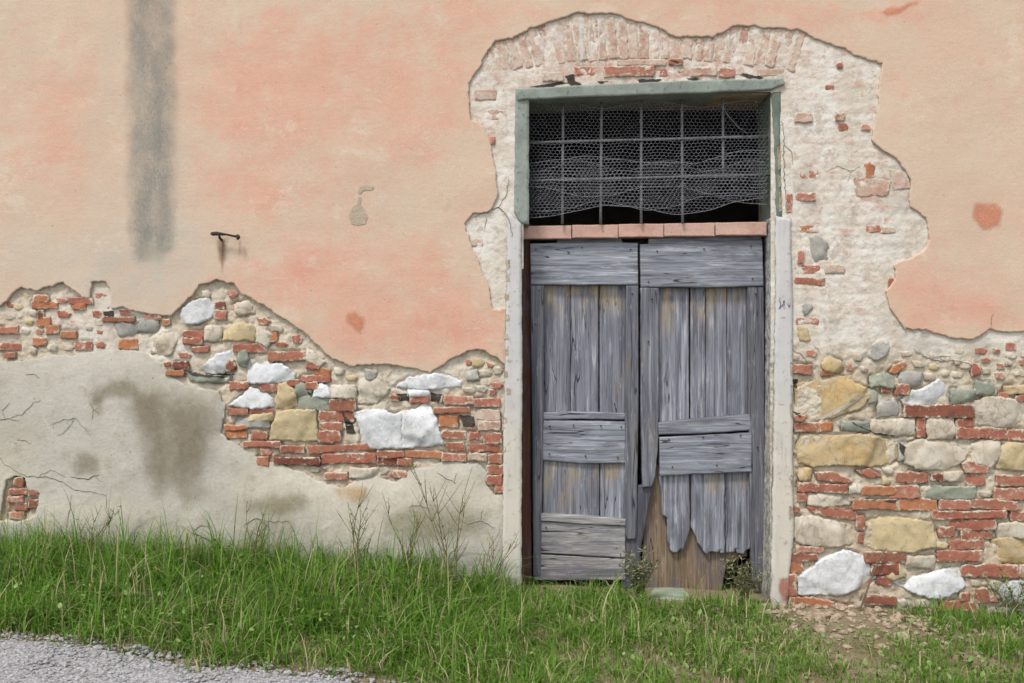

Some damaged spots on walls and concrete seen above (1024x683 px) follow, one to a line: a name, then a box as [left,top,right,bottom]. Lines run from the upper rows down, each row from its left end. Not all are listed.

damp [132,0,172,249]
peeling [349,185,374,225]
flaking render [0,476,40,521]
crack [0,374,110,522]
flaking render [0,280,510,495]
flaking render [465,13,1024,614]